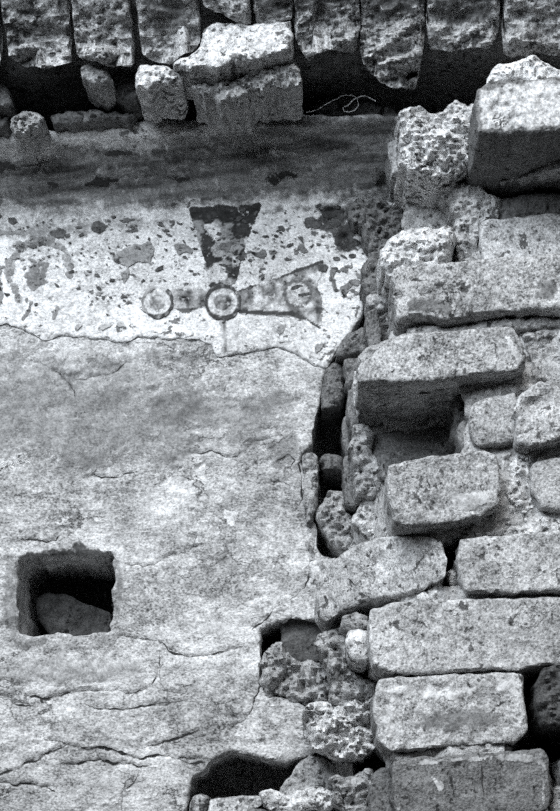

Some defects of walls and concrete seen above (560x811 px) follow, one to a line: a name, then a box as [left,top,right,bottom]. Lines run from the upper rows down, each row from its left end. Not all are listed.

peeling [0,161,29,173]
peeling [85,176,119,187]
peeling [265,171,298,186]
peeling [0,203,364,307]
spalling [407,297,451,315]
spalling [535,276,557,298]
peeling [302,452,320,526]
crack [252,573,310,629]
crack [0,635,242,710]
crack [228,667,261,729]
crack [0,730,204,809]